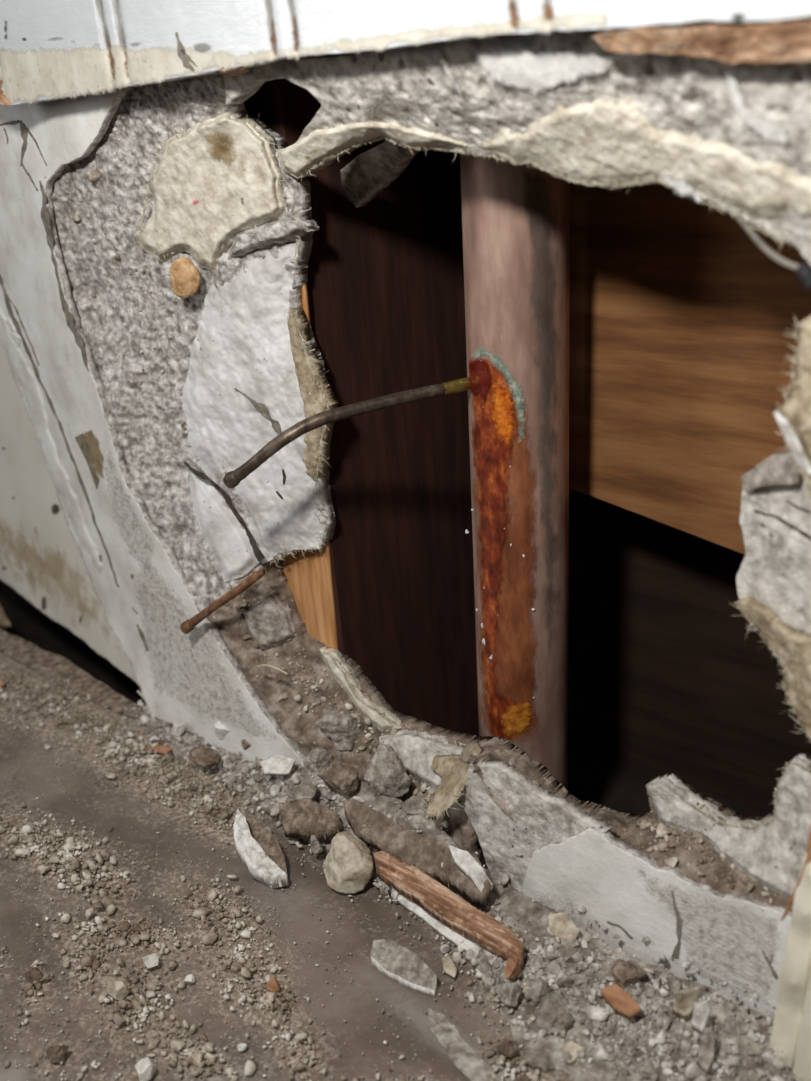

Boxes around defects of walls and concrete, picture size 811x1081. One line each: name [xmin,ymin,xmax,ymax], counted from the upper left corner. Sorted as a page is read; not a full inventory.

peeling [0,45,192,103]
crack [0,120,89,371]
peeling [0,306,103,573]
crack [0,274,149,651]
flaking render [52,12,811,912]
corrosion [469,358,537,741]
crack [754,500,811,540]
peeling [442,956,457,979]
peeling [538,894,596,940]
flaking render [640,871,778,1001]